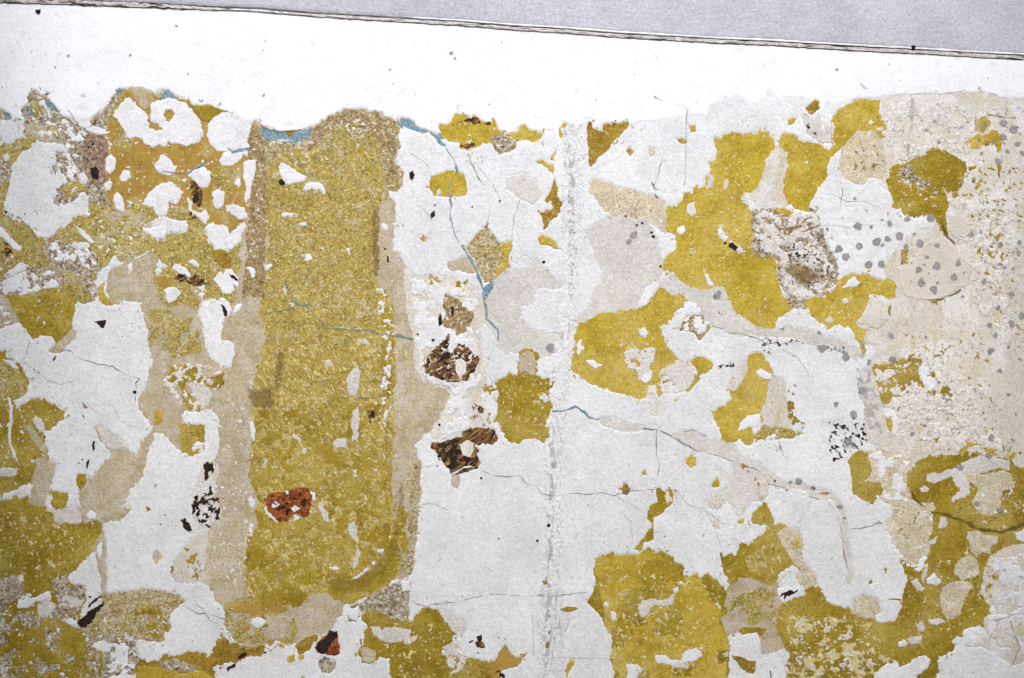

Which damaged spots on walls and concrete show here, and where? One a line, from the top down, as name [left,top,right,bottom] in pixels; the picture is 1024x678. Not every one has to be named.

peeling [0,75,567,678]
crack [410,146,531,340]
spalling [561,84,1024,678]
crack [911,491,1024,533]